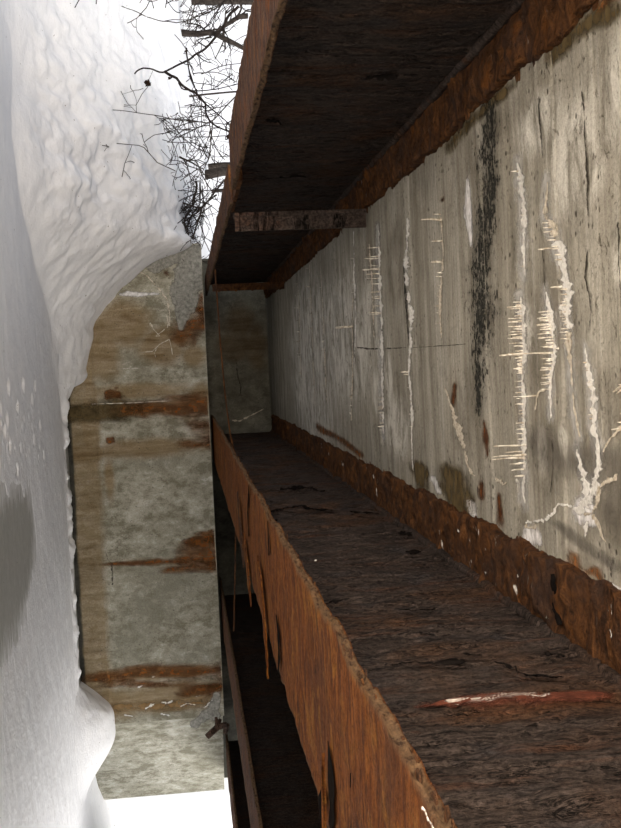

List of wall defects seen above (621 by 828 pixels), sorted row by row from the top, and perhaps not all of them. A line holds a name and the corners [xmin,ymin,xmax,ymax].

rust [546,0,621,65]
rust [445,83,517,153]
crack [613,222,621,301]
water stain [464,99,621,568]
rust [67,387,210,447]
rust [316,424,363,458]
rust [411,460,429,489]
rust [440,462,485,515]
rust [106,530,216,573]
rust [243,530,269,679]
rust [90,665,222,697]